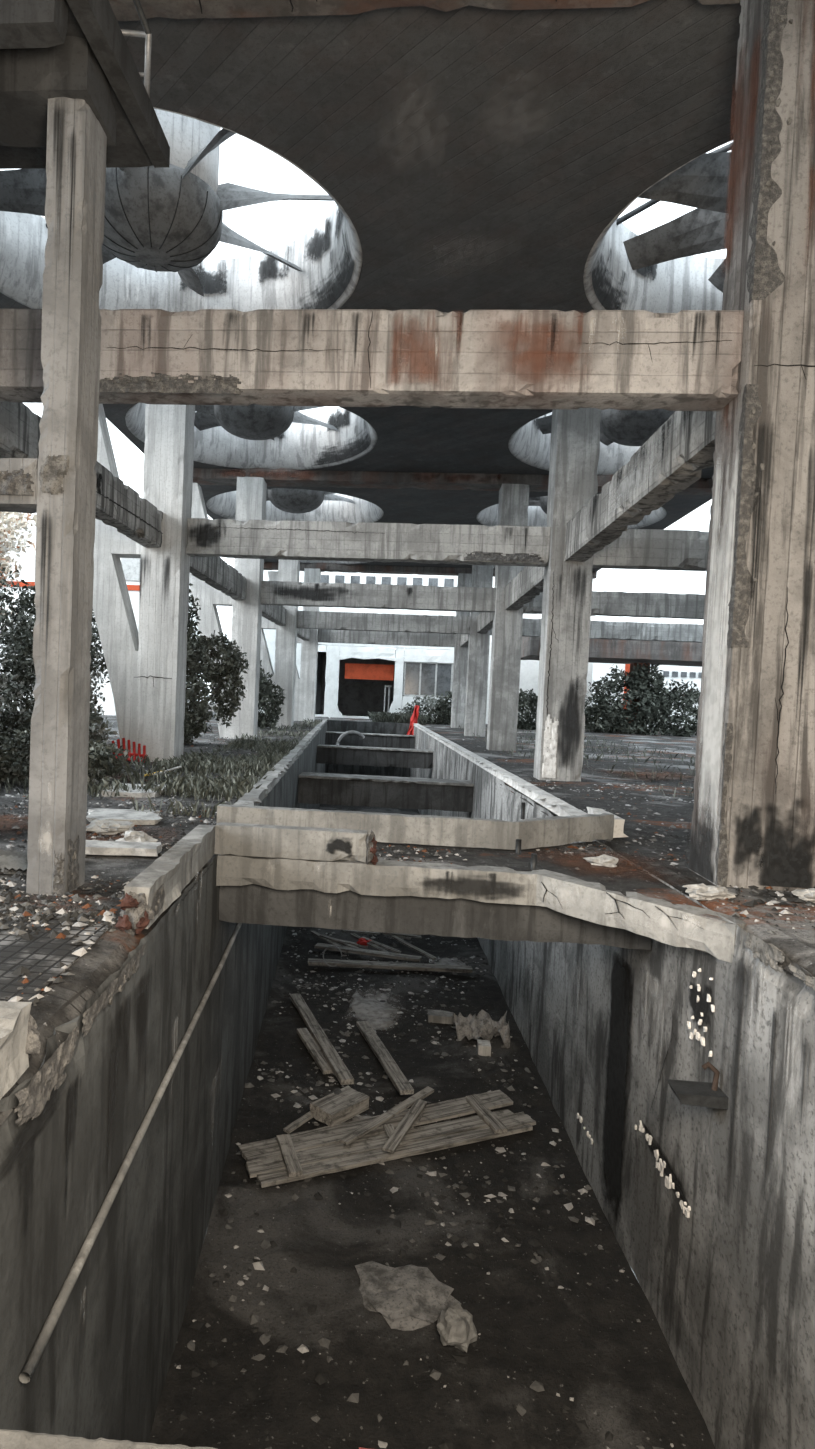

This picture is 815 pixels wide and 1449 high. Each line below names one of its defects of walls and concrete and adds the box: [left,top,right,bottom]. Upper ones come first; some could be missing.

spalling [746,0,793,303]
spalling [99,372,243,394]
spalling [0,455,69,496]
leakage [751,427,772,645]
leakage [799,452,815,691]
leakage [558,679,580,765]
leakage [685,454,738,882]
spalling [319,804,420,815]
leakage [734,801,815,888]
leakage [731,961,758,1130]
leakage [766,1013,776,1158]
spalling [148,926,715,1449]